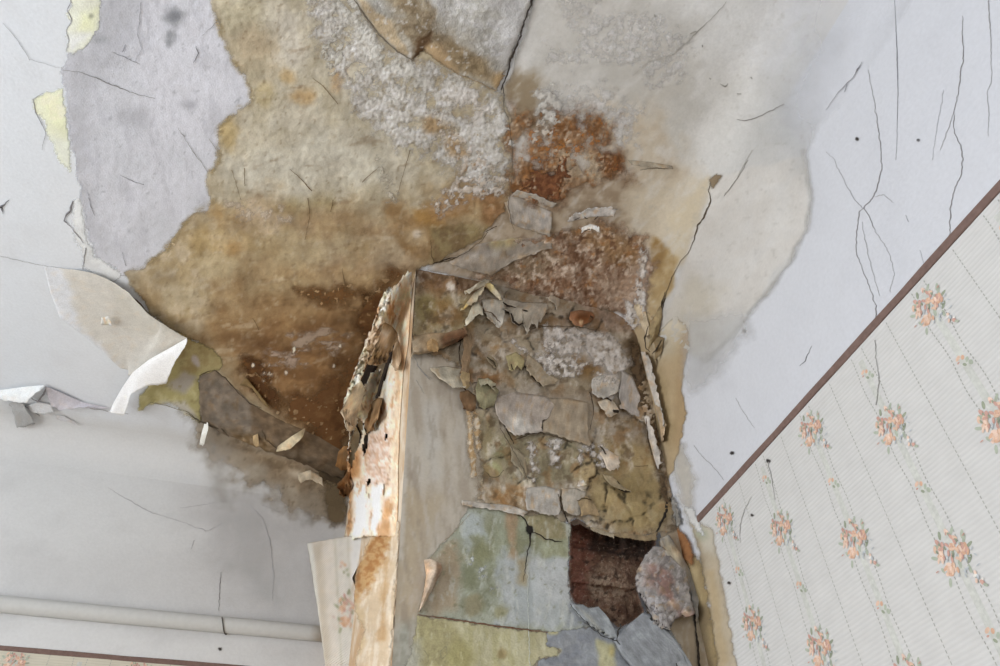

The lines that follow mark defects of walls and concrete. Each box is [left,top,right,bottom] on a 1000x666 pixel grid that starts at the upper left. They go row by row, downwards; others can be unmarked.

peeling [0,0,251,428]
leakage [124,0,812,536]
peeling [431,190,600,334]
crack [501,0,533,183]
rust [502,84,632,205]
peeling [568,206,617,233]
crack [828,0,908,405]
crack [932,16,964,235]
crack [985,0,993,127]
peeling [337,269,417,540]
peeling [418,302,666,666]
crack [520,496,568,580]